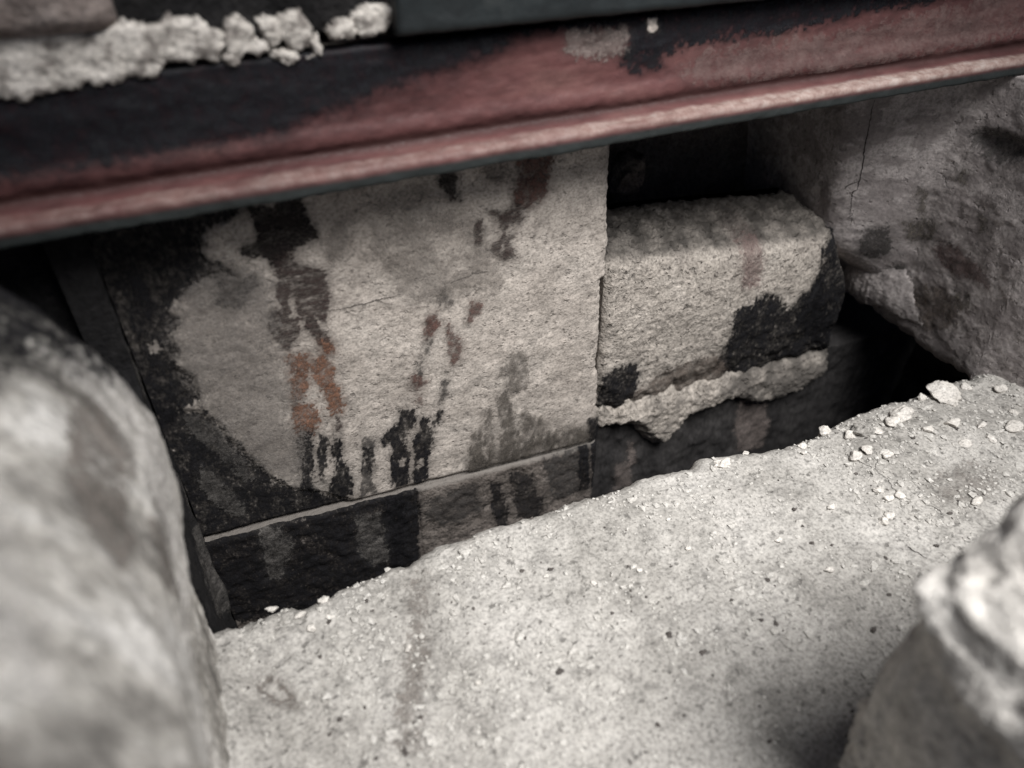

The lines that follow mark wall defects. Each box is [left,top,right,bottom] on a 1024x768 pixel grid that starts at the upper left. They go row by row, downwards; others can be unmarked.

rust [474,156,555,261]
crack [845,100,875,222]
damp [165,257,307,487]
rust [240,198,354,499]
damp [630,278,834,401]
damp [197,464,245,517]